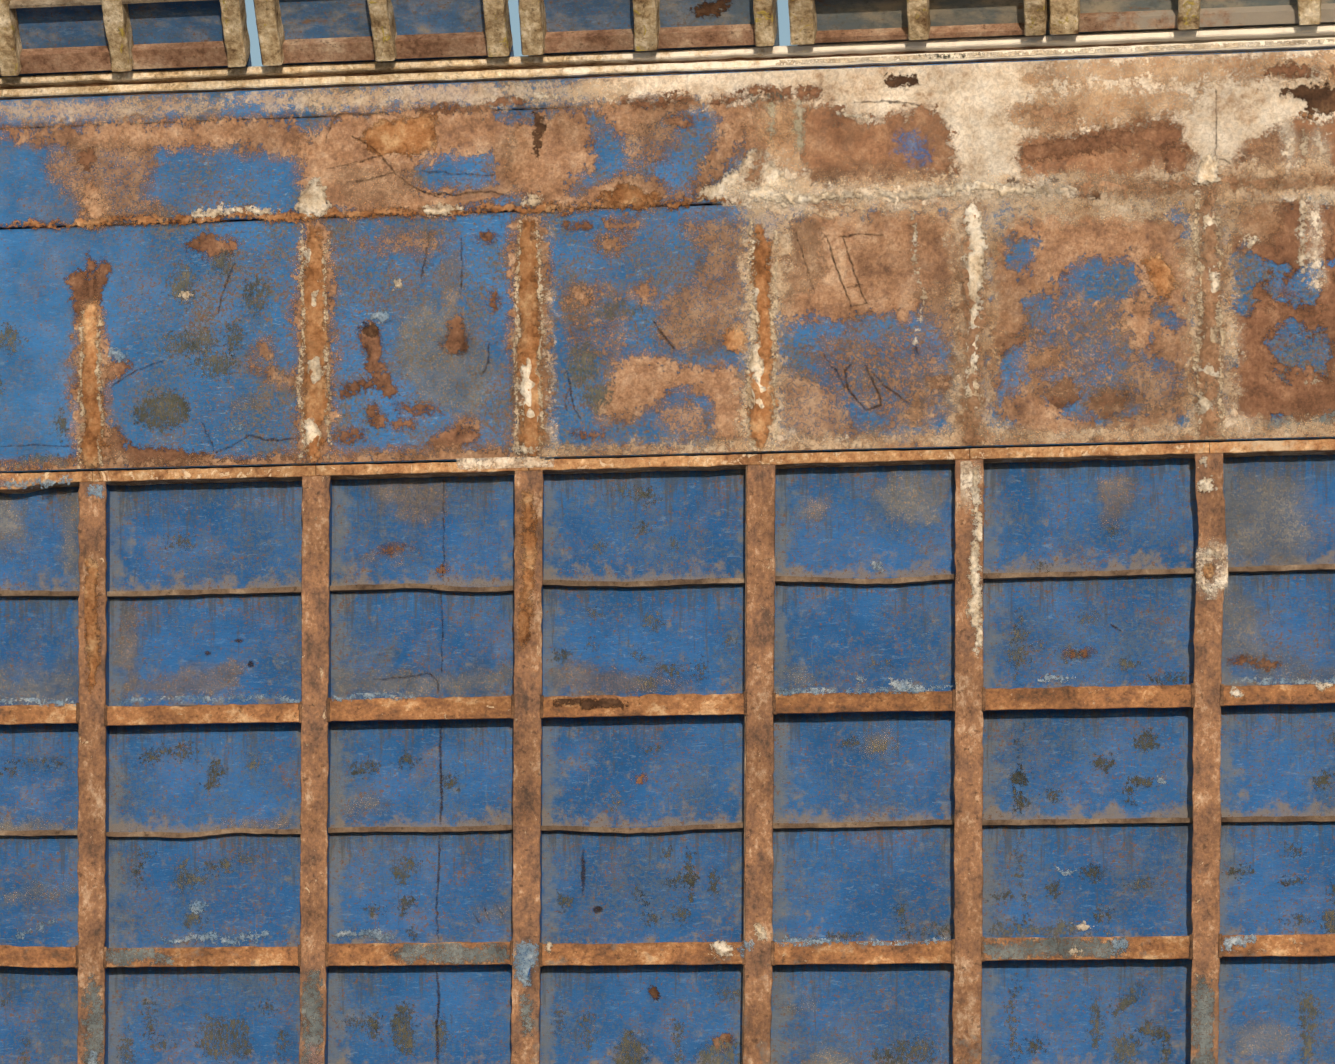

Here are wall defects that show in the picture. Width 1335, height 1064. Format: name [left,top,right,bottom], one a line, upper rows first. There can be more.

corrosion [0,59,1335,471]
leakage [0,39,1335,699]
corrosion [84,556,101,694]
corrosion [518,490,538,649]
corrosion [553,698,629,711]
leakage [612,1028,653,1064]
corrosion [648,985,661,1001]
leakage [667,1018,742,1064]